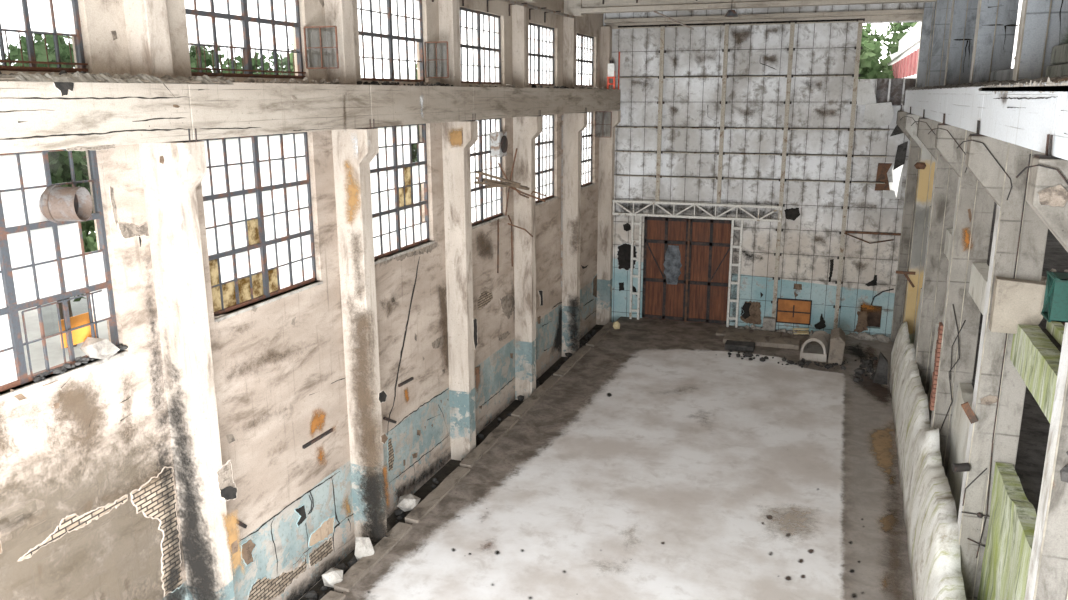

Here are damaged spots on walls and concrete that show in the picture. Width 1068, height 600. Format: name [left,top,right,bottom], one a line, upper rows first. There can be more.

crack [993,96,1066,134]
rust [345,163,360,221]
damp [439,288,449,369]
damp [58,383,104,445]
damp [352,312,380,481]
spalling [216,460,237,502]
flaking render [17,466,183,598]
damp [159,445,185,600]
peeling [231,538,256,566]
flaking render [246,516,335,600]
spalling [294,504,307,527]